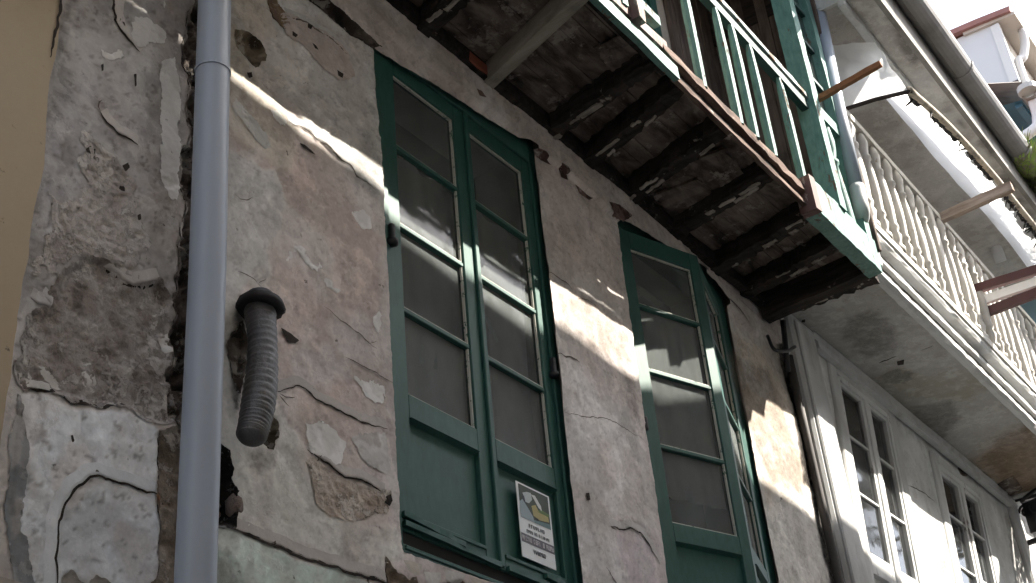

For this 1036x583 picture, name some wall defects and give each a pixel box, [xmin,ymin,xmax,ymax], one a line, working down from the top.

peeling [131,16,166,47]
flaking render [234,29,267,68]
peeling [267,0,382,81]
peeling [159,57,182,200]
flaking render [4,130,181,583]
crack [278,375,387,429]
flaking render [306,421,392,522]
crack [43,462,157,583]
flaking render [385,556,492,583]